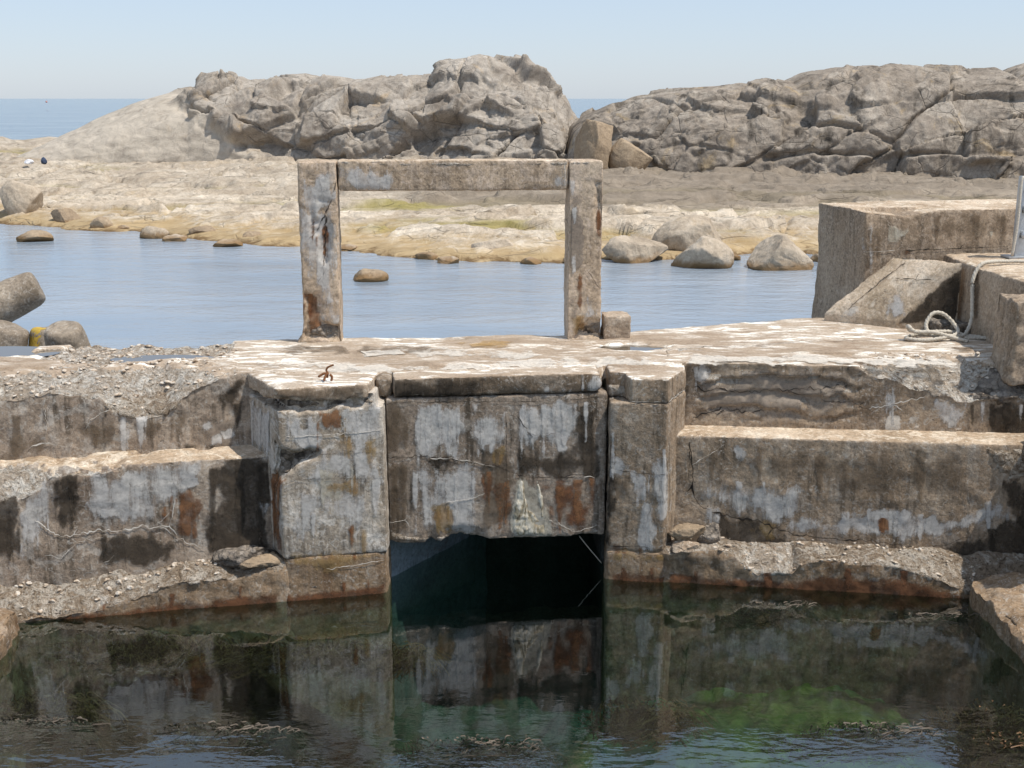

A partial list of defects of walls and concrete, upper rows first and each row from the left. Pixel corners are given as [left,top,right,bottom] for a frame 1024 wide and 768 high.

crack [314,169,339,282]
water stain [0,474,77,560]
water stain [99,532,174,566]
corrosion [163,489,202,538]
corrosion [317,410,351,456]
spalling [391,532,469,542]
water stain [256,345,673,551]
corrosion [482,446,512,529]
corrosion [546,477,594,529]
corrosion [613,549,962,599]
crack [669,384,970,548]